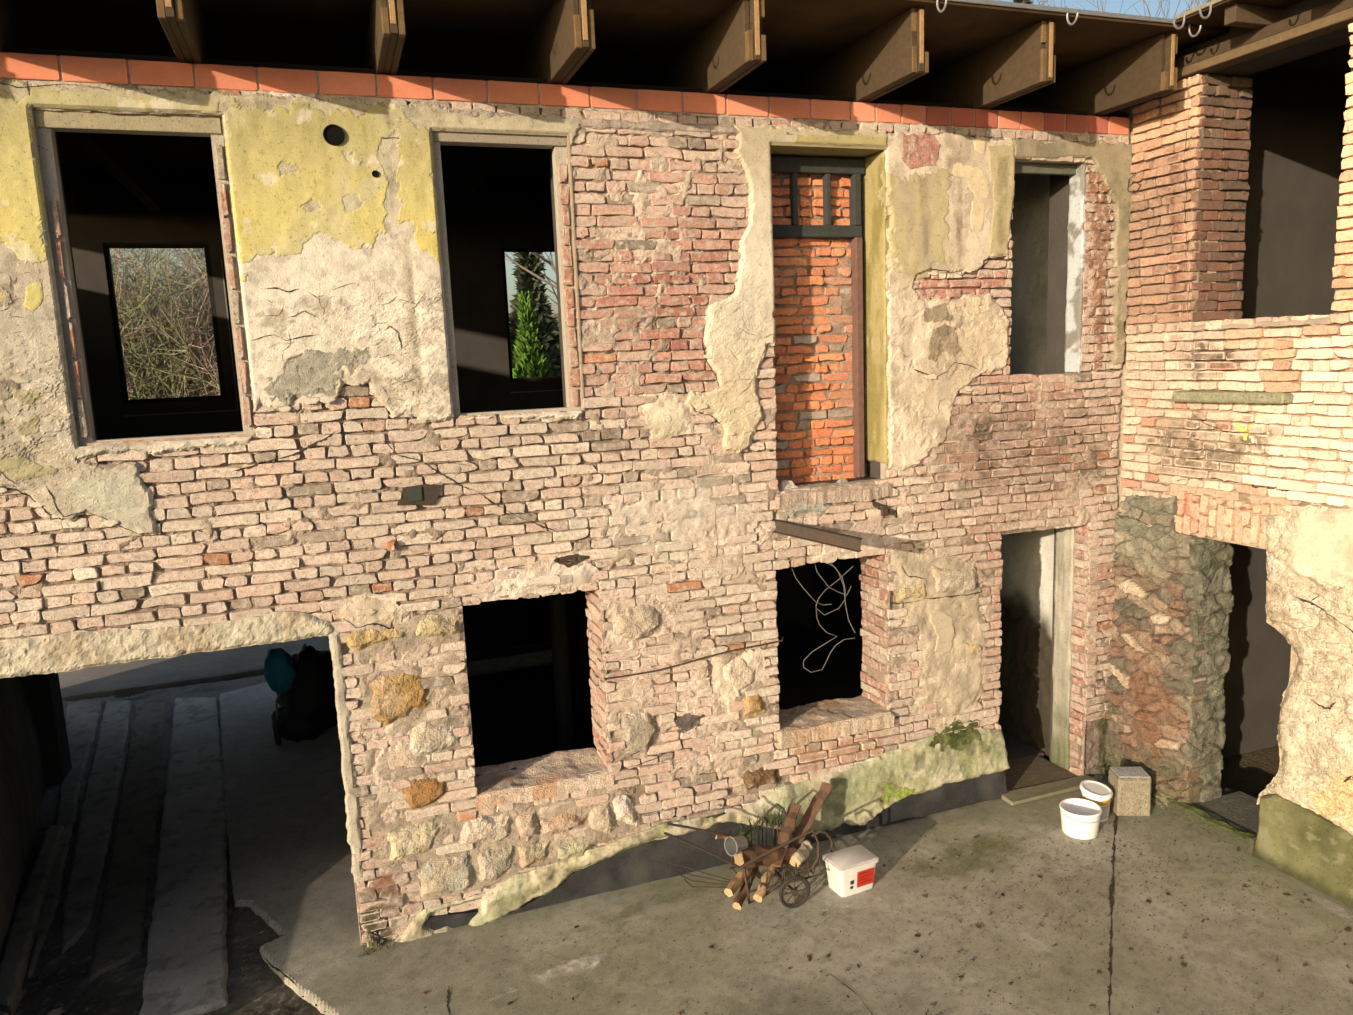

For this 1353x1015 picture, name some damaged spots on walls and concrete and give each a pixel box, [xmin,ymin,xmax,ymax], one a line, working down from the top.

flaking render [0,77,583,536]
crack [251,283,425,402]
flaking render [638,123,1134,471]
flaking render [813,531,988,720]
flaking render [1266,503,1353,778]
crack [444,988,452,1015]
crack [1107,816,1118,1015]